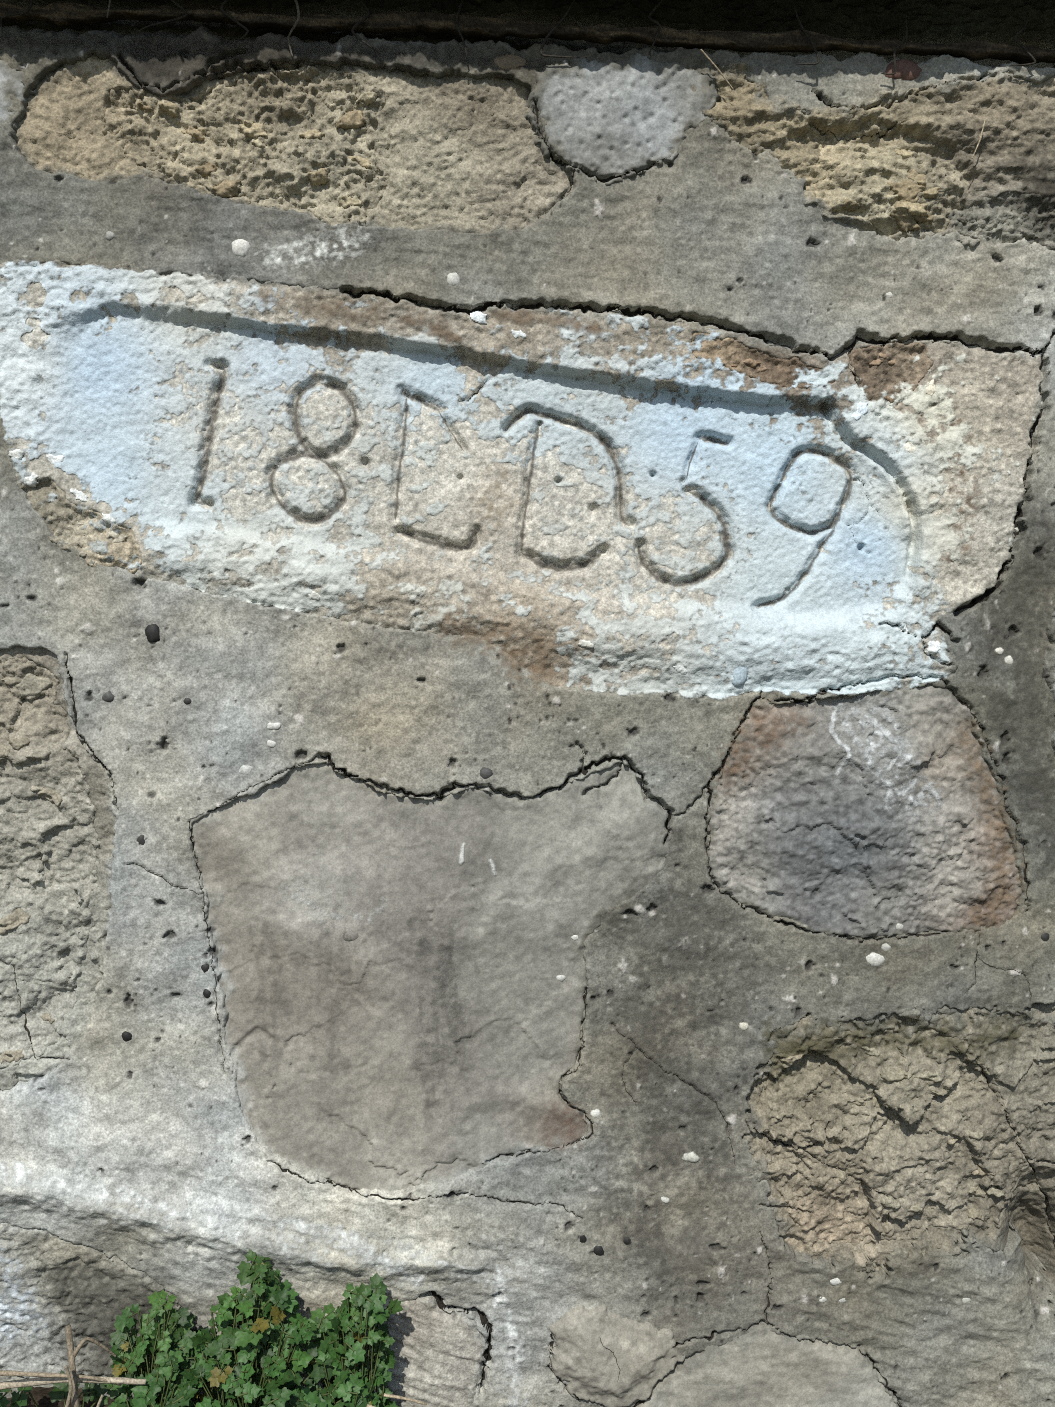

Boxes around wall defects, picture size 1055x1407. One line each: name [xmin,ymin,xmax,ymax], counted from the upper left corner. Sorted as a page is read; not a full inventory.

peeling [0,261,1020,700]
crack [127,290,1055,1072]
crack [548,1204,902,1407]
spalling [758,1029,1027,1246]